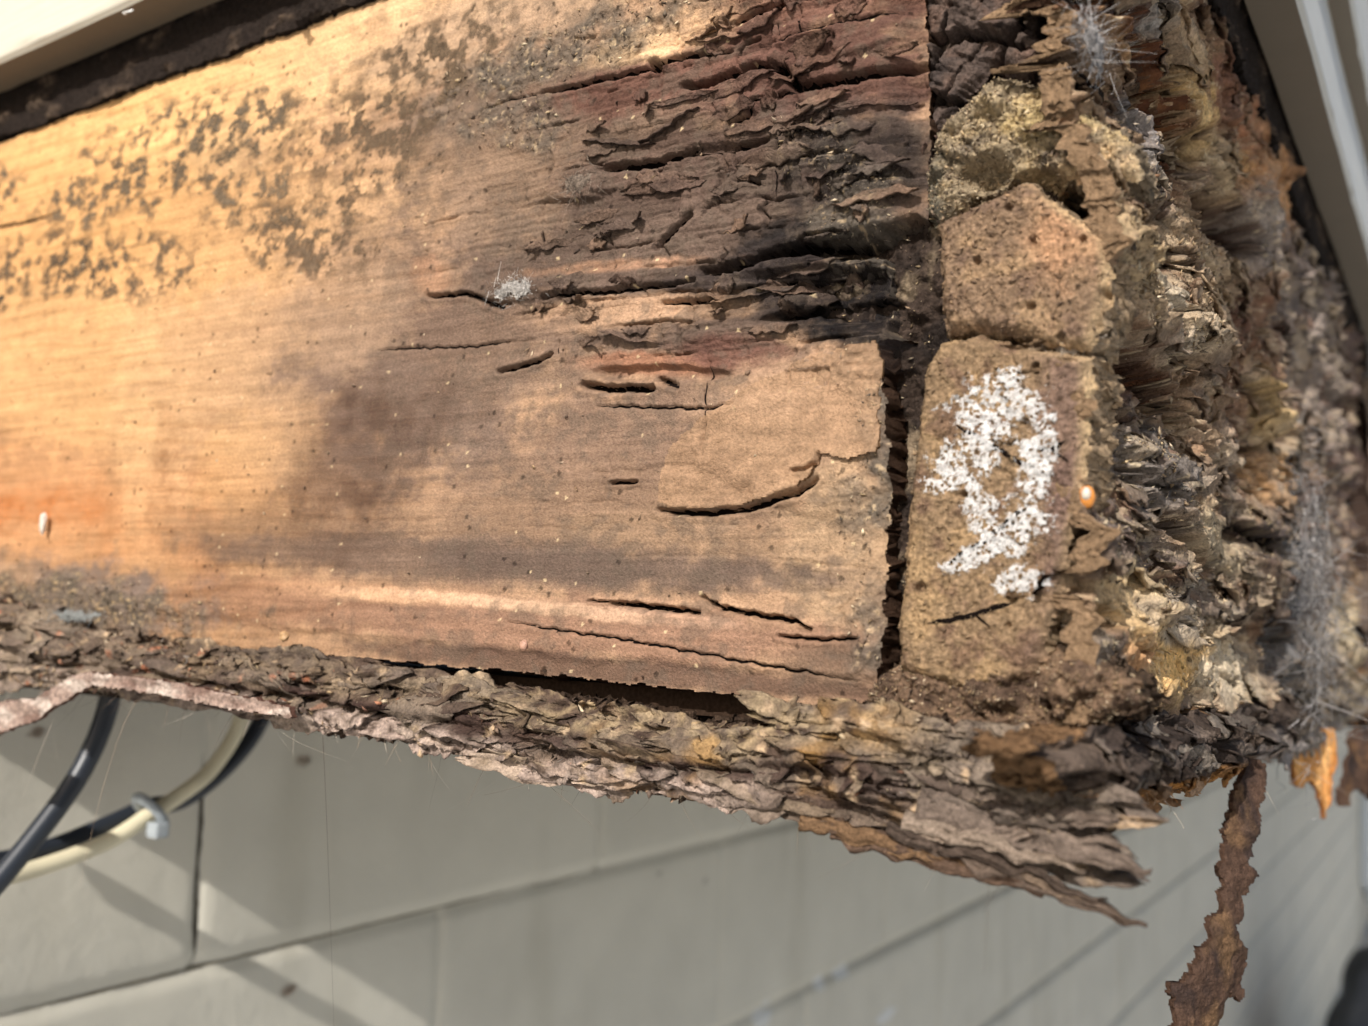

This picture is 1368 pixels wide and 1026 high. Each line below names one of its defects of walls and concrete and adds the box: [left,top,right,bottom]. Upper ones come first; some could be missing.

crack [477,0,932,196]
spalling [1068,0,1195,138]
mould [0,10,504,302]
crack [549,243,873,320]
crack [380,292,559,373]
crack [590,366,723,424]
crack [667,466,818,517]
crack [511,597,857,681]
peeling [0,671,297,736]
peeling [1334,728,1368,807]
peeling [1164,759,1267,1026]